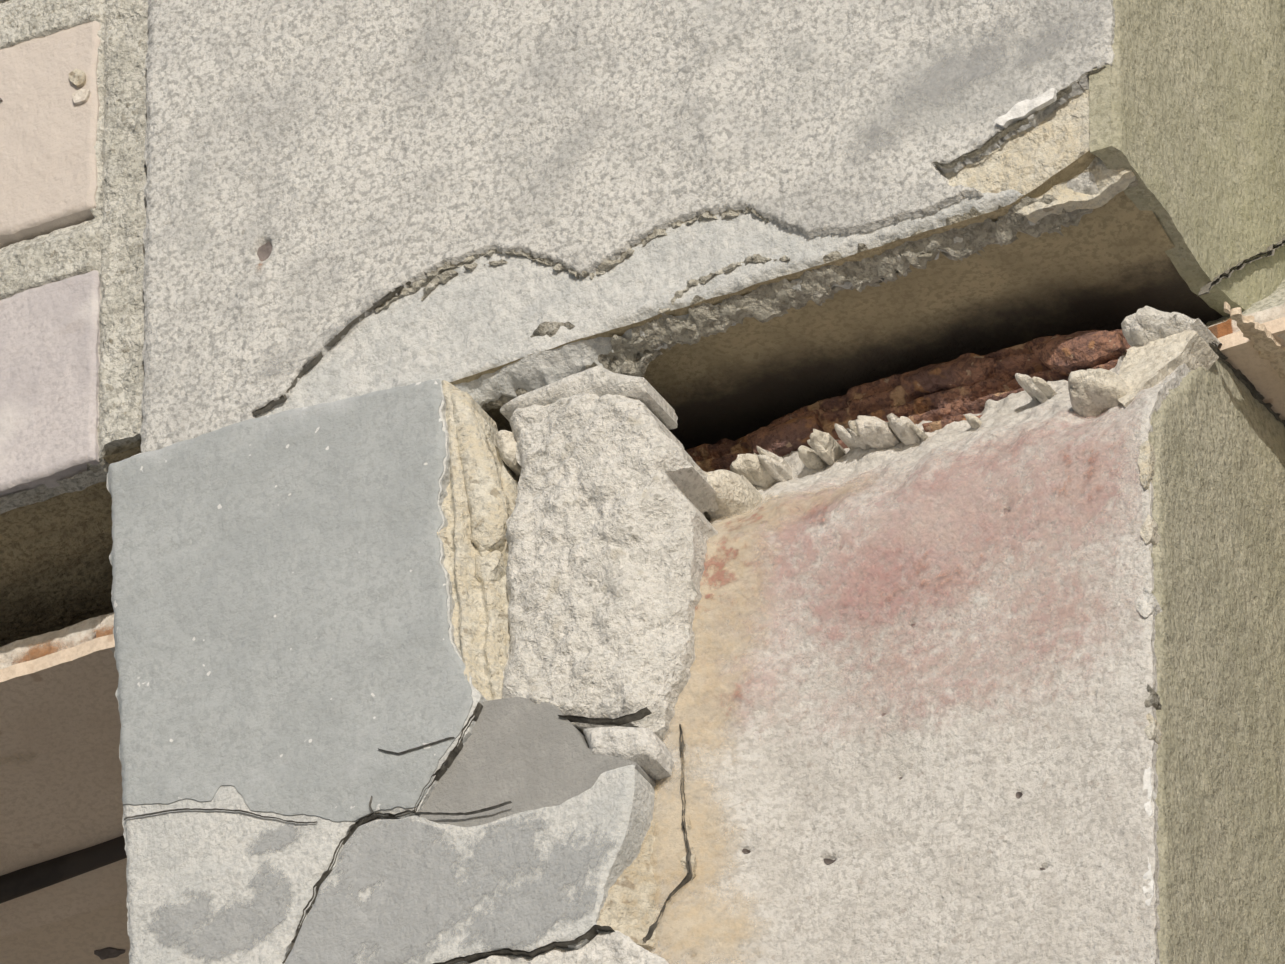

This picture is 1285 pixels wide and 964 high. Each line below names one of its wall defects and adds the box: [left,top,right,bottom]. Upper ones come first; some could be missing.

crack [1198,237,1285,296]
corrosion [899,353,996,400]
corrosion [1032,330,1127,376]
corrosion [745,412,824,457]
peeling [107,66,1136,964]
crack [124,702,512,964]
crack [433,925,615,964]